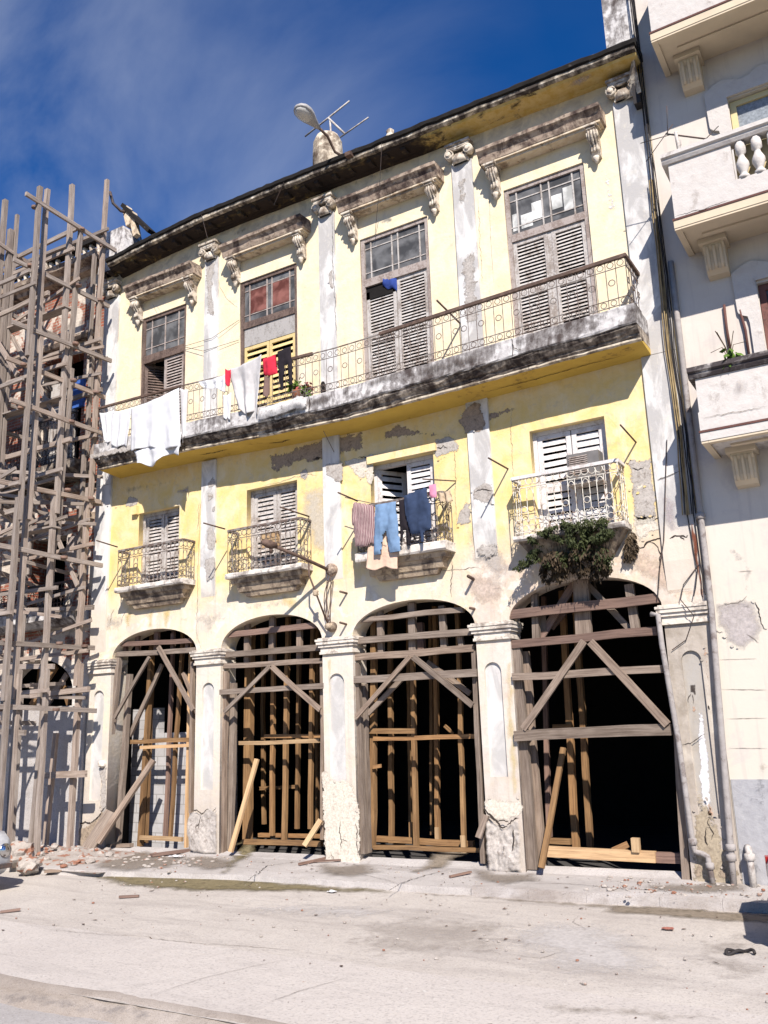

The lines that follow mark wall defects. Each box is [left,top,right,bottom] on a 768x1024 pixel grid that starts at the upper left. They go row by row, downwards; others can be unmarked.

peeling [385,402,512,461]
peeling [270,432,374,484]
peeling [456,483,495,527]
peeling [627,458,673,541]
peeling [716,600,760,649]
spalling [321,771,361,863]
spalling [484,796,523,821]